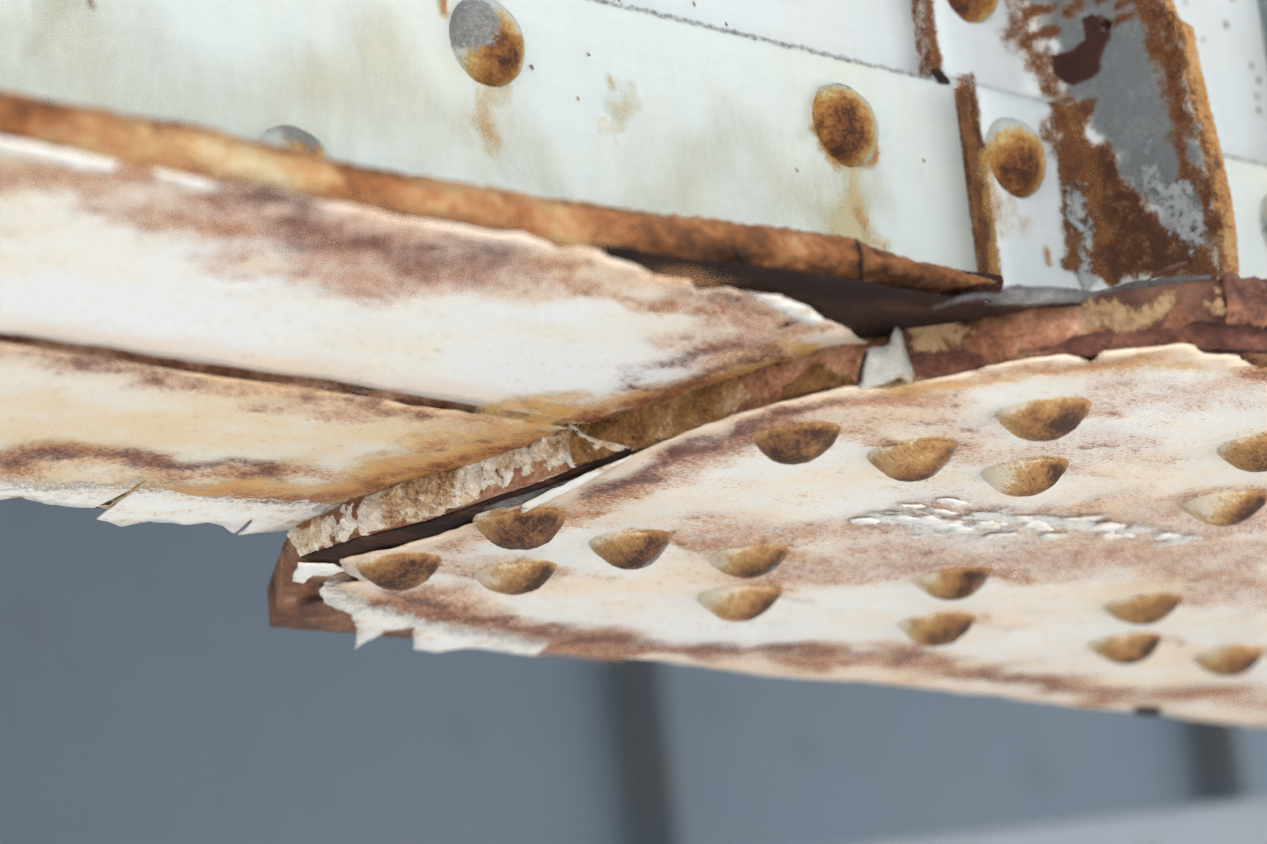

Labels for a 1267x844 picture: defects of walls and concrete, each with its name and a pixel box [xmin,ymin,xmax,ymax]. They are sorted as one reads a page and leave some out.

peeling [0,138,118,172]
peeling [153,169,230,193]
corrosion [911,0,1015,310]
corrosion [1001,0,1239,335]
corrosion [0,126,1267,533]
spalling [592,241,1025,390]
crack [857,351,868,386]
peeling [0,473,341,535]
peeling [521,455,632,514]
corrosion [671,485,1267,610]
peeling [849,498,1204,548]
peeling [293,562,554,656]